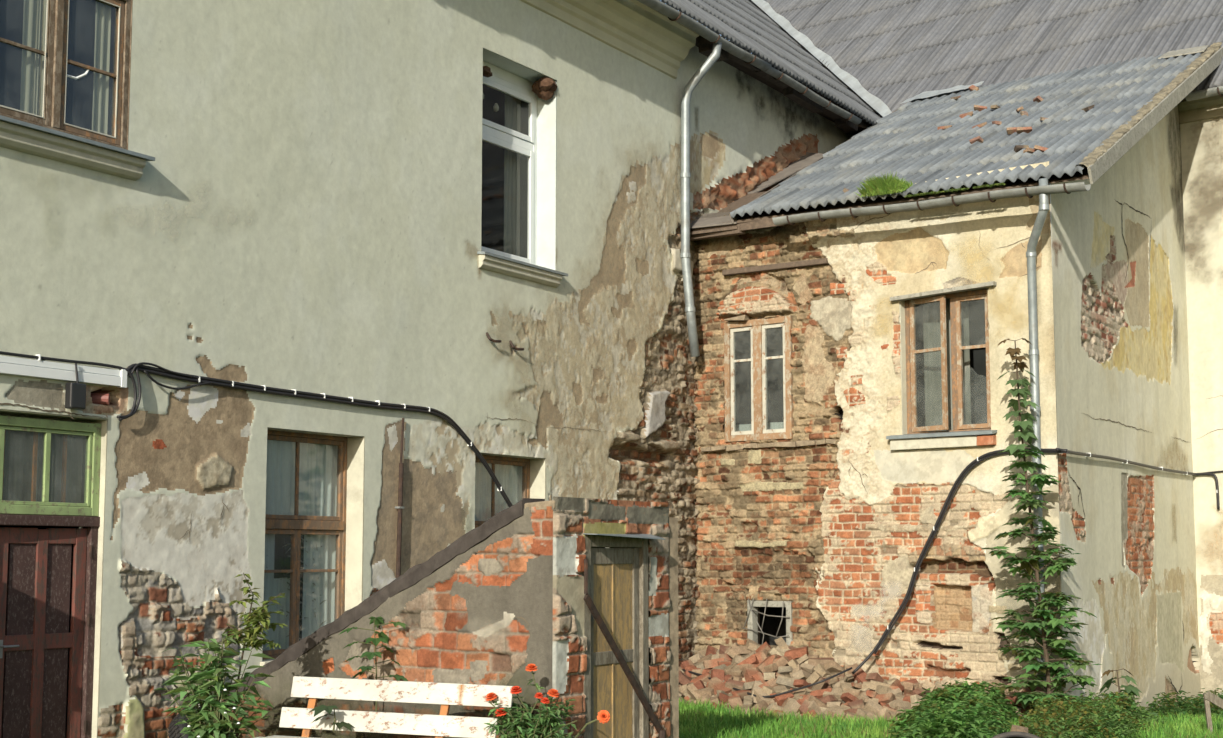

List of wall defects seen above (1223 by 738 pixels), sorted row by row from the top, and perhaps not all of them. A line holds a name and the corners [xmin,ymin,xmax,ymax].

flaking render [999,194,1051,278]
peeling [1081,211,1174,385]
water stain [1169,113,1223,265]
spalling [322,130,1022,686]
flaking render [80,323,255,738]
peeling [552,639,570,699]
flaking render [1071,472,1223,707]